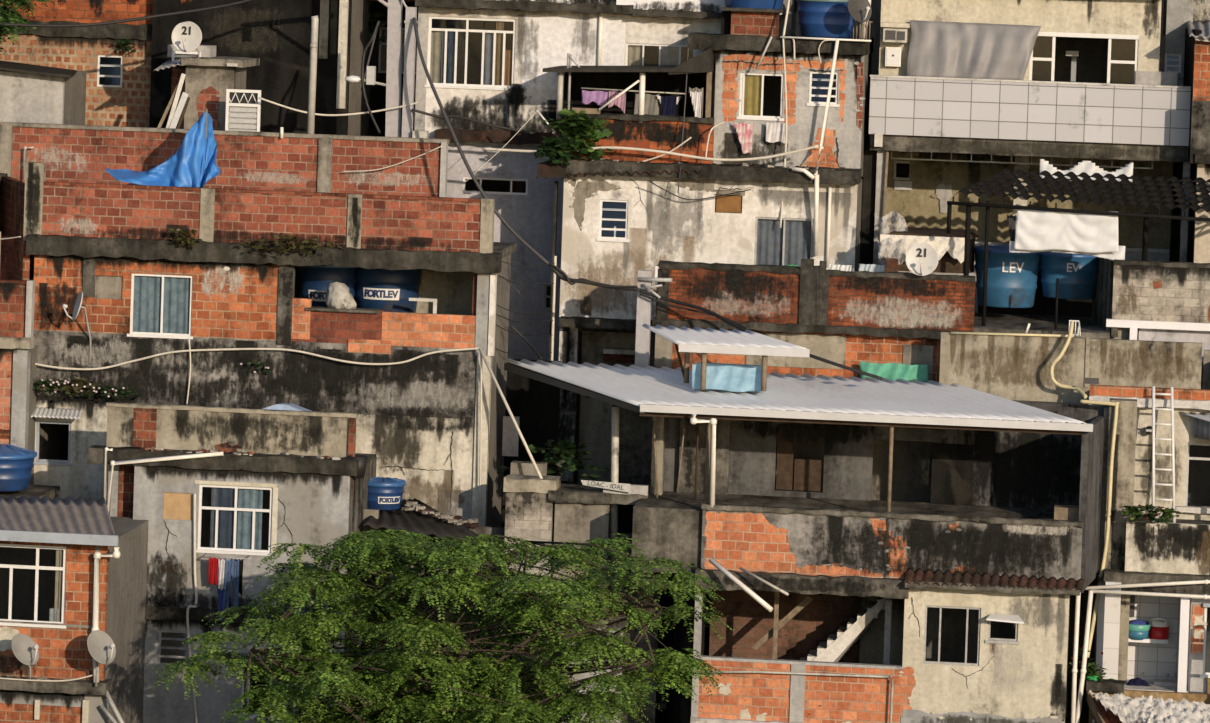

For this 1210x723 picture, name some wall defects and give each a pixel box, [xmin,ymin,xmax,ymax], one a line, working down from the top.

damp [432,0,616,134]
flaking render [721,53,865,168]
damp [213,198,451,249]
damp [760,185,851,226]
damp [1118,265,1210,313]
damp [34,255,477,515]
damp [921,429,1081,509]
damp [1106,434,1210,569]
flaking render [702,511,910,579]
damp [712,515,1072,592]
damp [145,552,330,646]
damp [1050,664,1067,721]